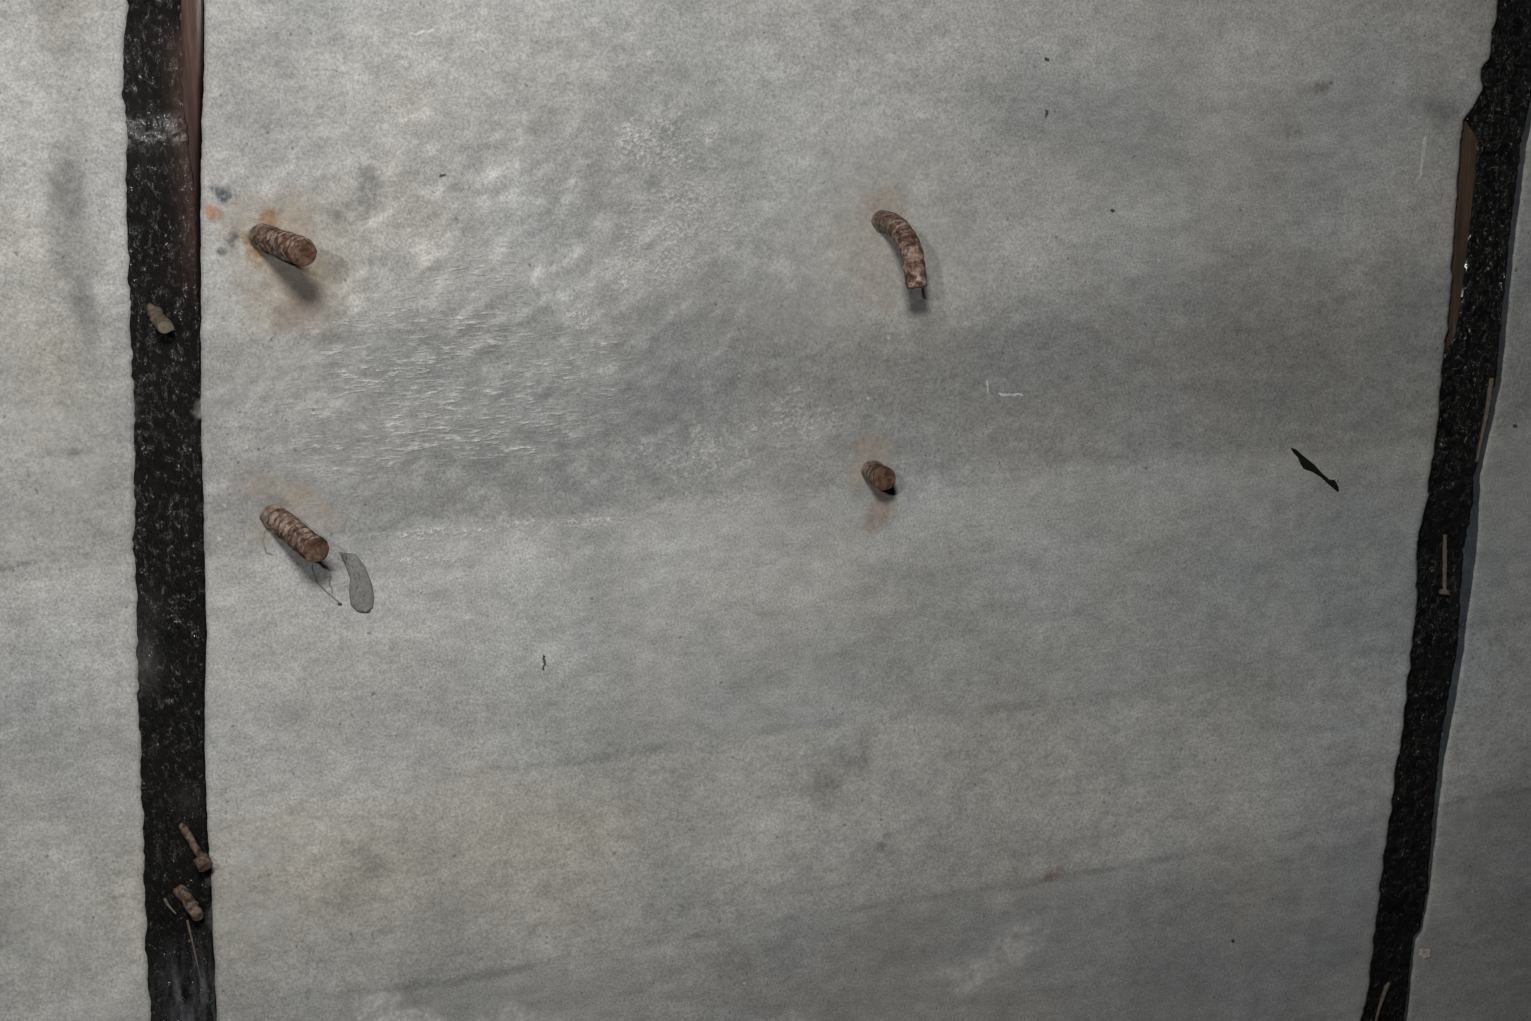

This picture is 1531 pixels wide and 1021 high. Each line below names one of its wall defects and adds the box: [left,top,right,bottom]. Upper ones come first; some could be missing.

corrosion [259,204,312,235]